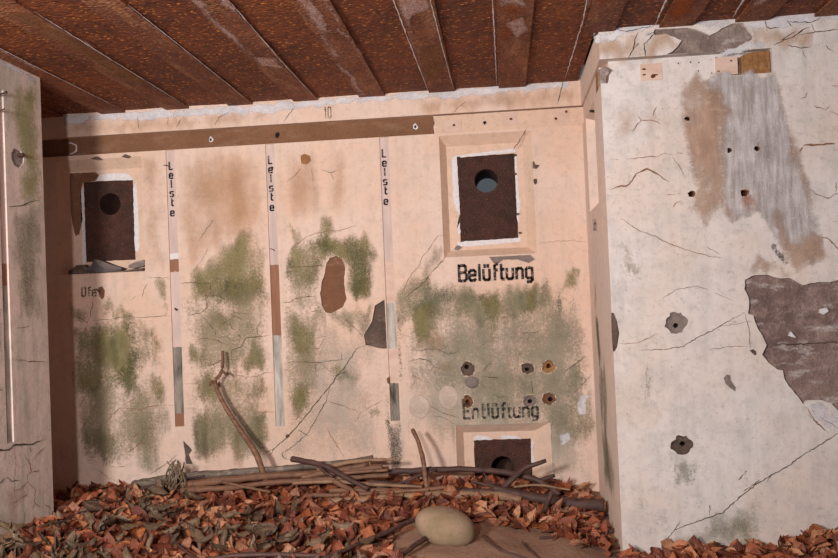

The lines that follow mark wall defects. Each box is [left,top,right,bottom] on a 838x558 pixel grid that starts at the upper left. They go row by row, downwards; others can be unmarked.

flaking render [594,13,838,55]
water stain [684,71,824,267]
crack [76,222,377,460]
flaking render [320,256,347,313]
flaking render [364,300,387,349]
water stain [413,291,451,342]
flaking render [744,275,838,410]
crack [0,439,50,520]
crack [95,398,165,482]
water stain [387,413,402,469]
water stain [577,395,589,415]
crack [659,409,838,549]